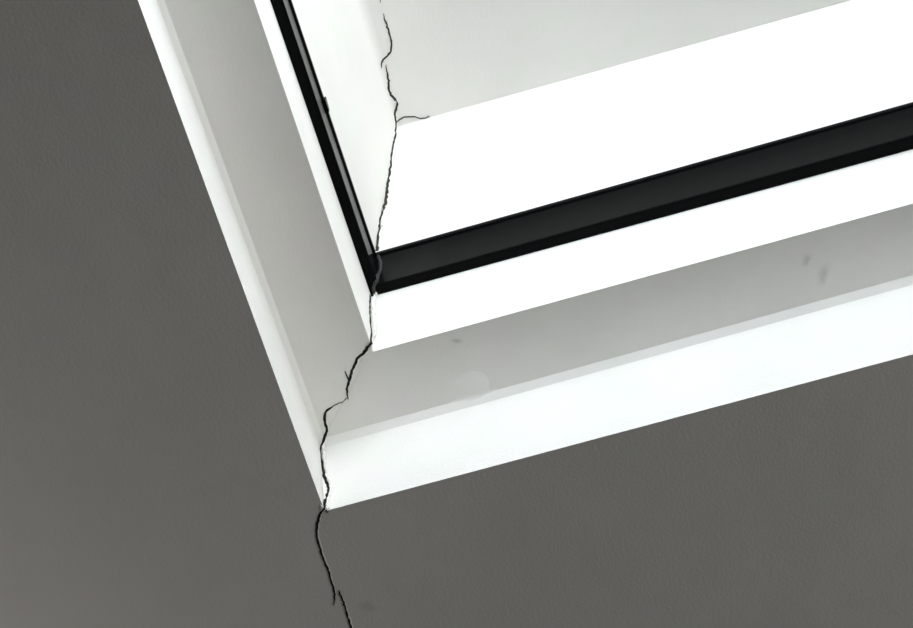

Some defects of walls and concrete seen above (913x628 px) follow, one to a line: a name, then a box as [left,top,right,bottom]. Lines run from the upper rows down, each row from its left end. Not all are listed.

crack [375,0,429,251]
crack [315,294,377,628]